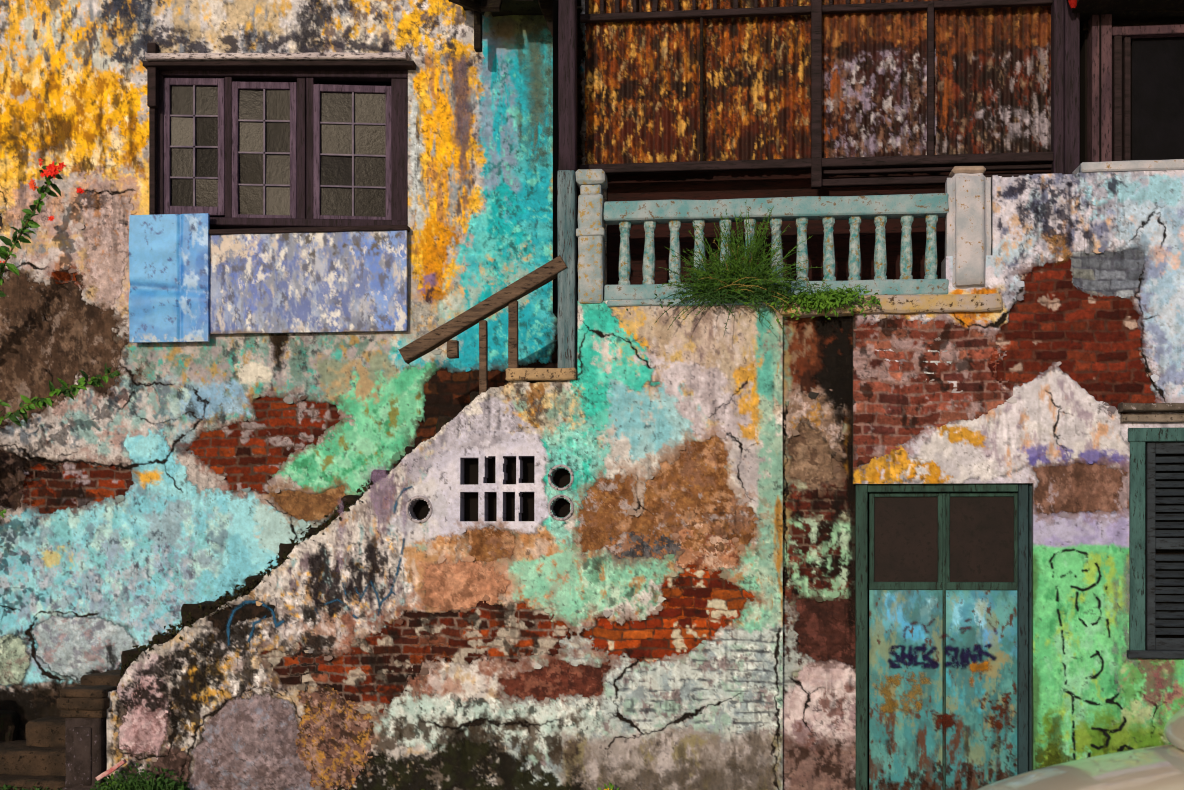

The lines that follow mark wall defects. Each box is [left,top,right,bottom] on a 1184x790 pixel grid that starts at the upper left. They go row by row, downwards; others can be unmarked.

crack [577,325,651,379]
flaking render [783,247,1159,469]
flaking render [19,460,134,514]
crack [0,364,209,491]
flaking render [186,394,340,494]
flaking render [260,432,759,714]
crack [0,605,98,681]
leakage [333,724,775,790]
crack [605,657,740,749]
rust [876,672,1018,790]